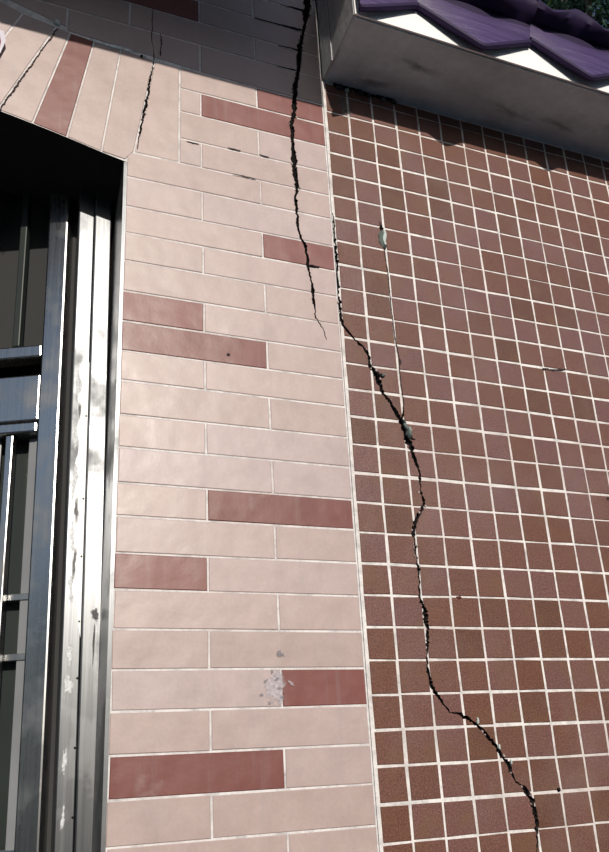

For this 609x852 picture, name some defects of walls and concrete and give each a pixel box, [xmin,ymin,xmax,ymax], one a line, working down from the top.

crack [0,29,58,111]
crack [137,33,162,150]
crack [254,0,346,331]
crack [365,221,536,831]
spalling [260,670,293,704]